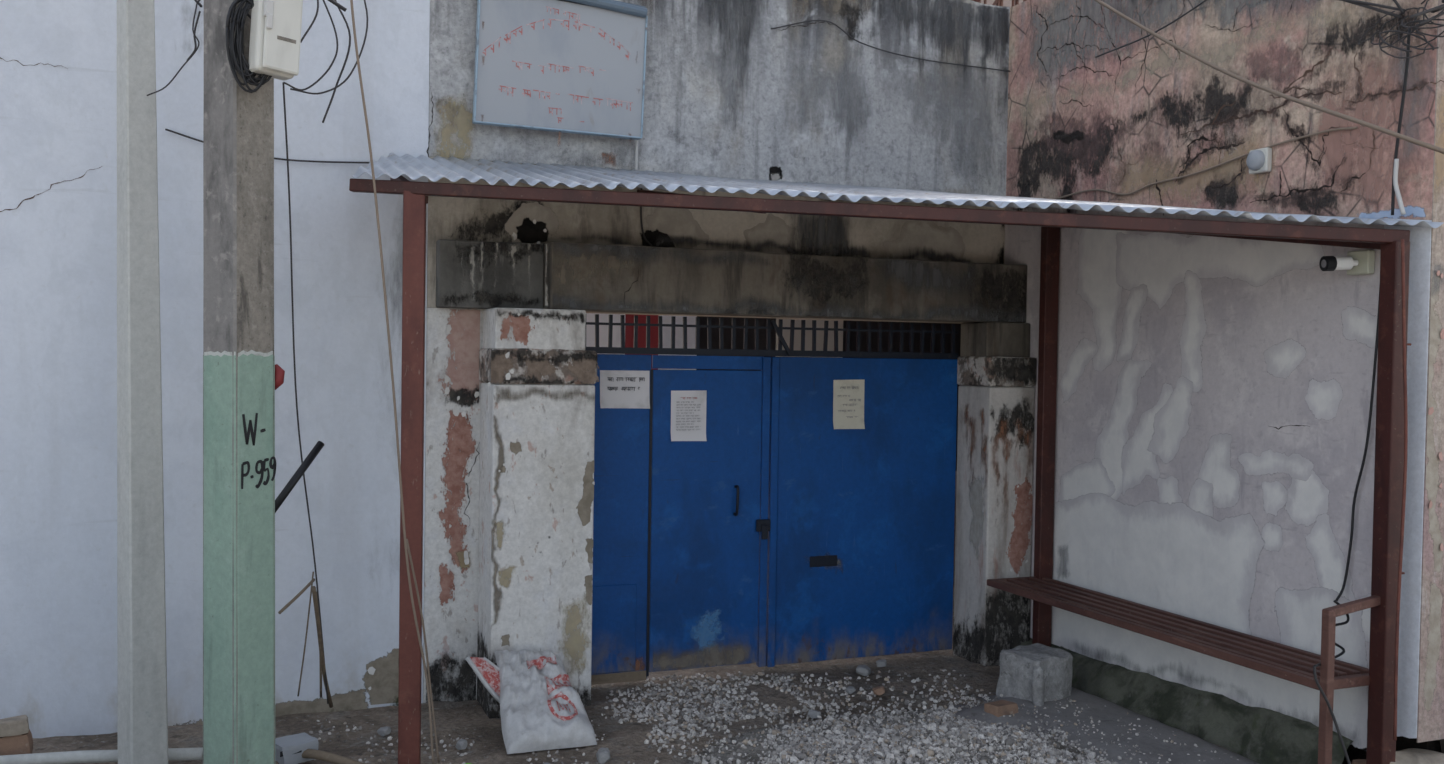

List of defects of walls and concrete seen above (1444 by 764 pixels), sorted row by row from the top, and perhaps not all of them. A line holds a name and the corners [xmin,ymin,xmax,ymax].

crack [0,166,102,212]
water stain [713,0,753,87]
water stain [793,0,1009,171]
crack [1035,0,1255,107]
water stain [1017,21,1282,213]
crack [1118,45,1444,215]
mould [1289,183,1338,216]
water stain [445,201,1027,323]
peeling [438,309,599,606]
peeling [491,417,522,646]
peeling [1006,476,1033,577]
spalling [275,648,399,717]